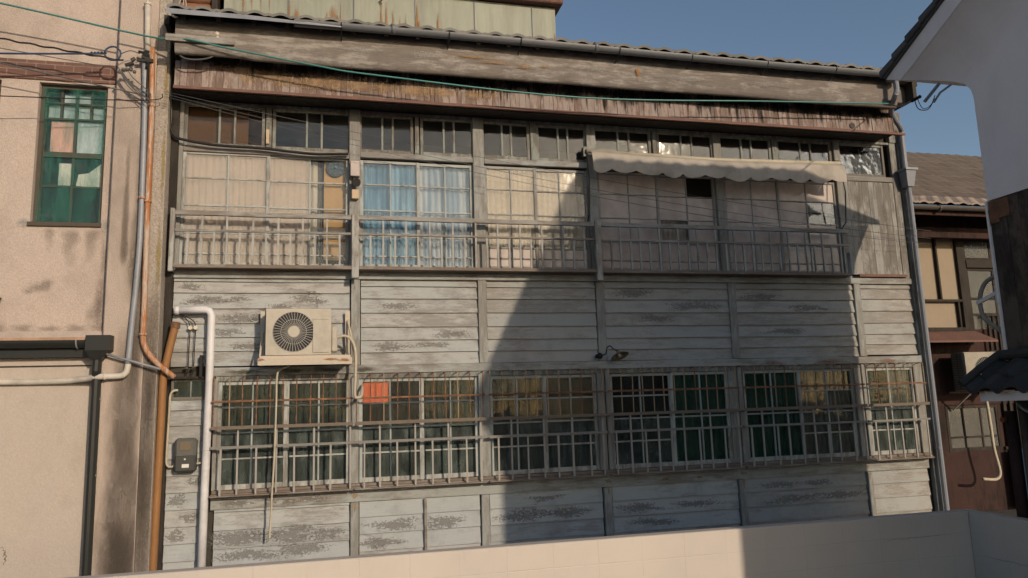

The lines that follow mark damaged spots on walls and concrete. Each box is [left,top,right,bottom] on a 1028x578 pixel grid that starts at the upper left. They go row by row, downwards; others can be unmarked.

water stain [212,57,886,125]
water stain [105,198,157,574]
rust [228,374,357,426]
rust [397,371,484,420]
rust [824,360,927,405]